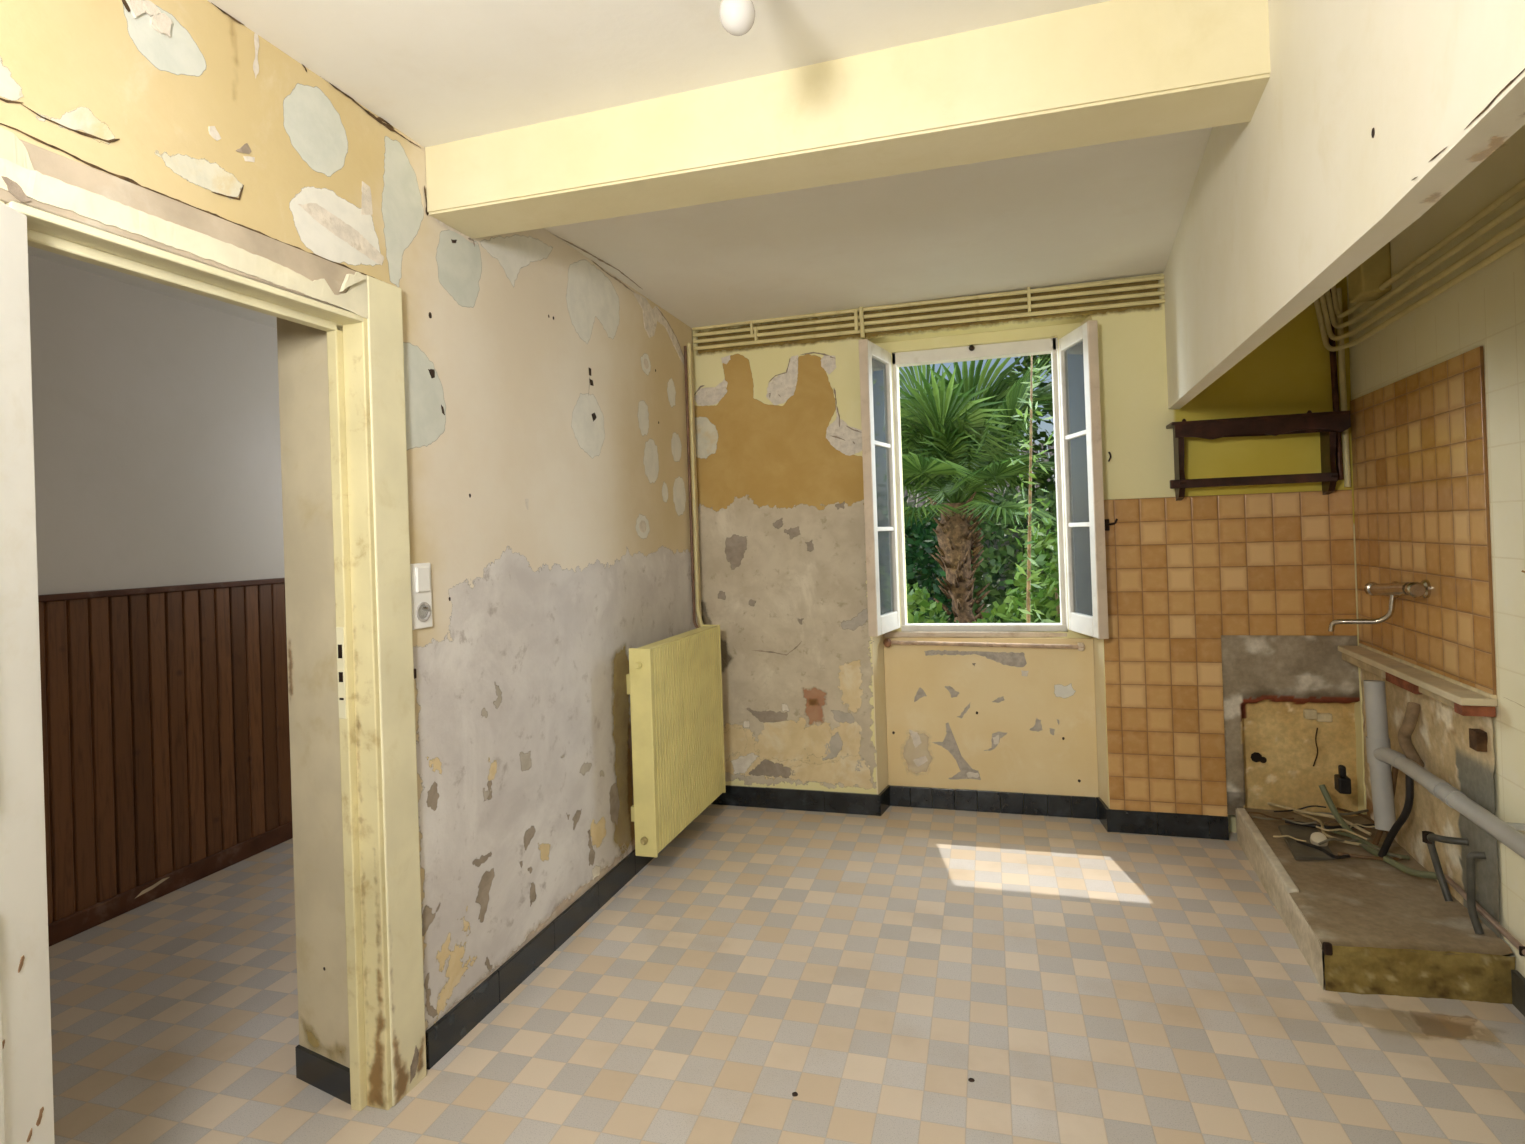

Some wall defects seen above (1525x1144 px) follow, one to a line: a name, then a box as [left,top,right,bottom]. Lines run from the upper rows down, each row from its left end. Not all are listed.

peeling [128,0,173,37]
peeling [0,57,120,144]
peeling [0,126,384,319]
peeling [413,352,877,1031]
peeling [909,686,981,780]
peeling [924,650,1028,677]
peeling [1030,718,1059,735]
spalling [1221,635,1501,939]